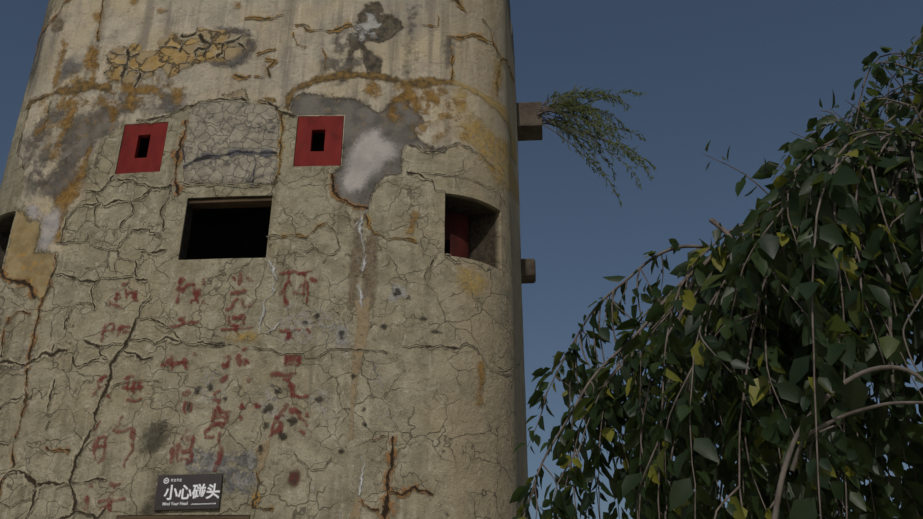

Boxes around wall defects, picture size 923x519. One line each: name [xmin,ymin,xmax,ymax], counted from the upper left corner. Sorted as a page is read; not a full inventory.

water stain [61,61,81,79]
peeling [104,27,252,87]
peeling [347,1,403,73]
water stain [23,109,77,193]
peeling [290,92,447,211]
water stain [3,205,62,300]
crack [0,0,520,519]